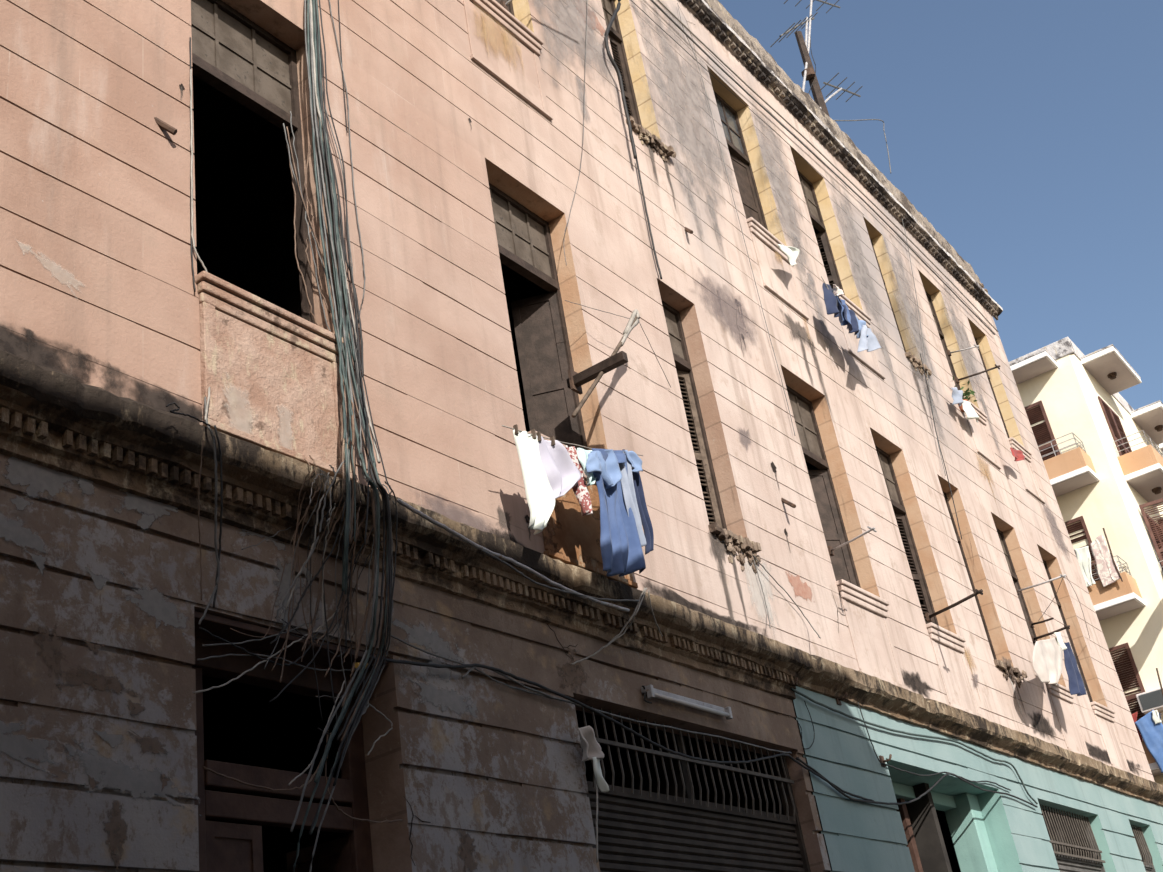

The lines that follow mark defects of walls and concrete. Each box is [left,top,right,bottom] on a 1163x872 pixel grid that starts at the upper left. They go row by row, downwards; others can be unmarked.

damp [535,0,612,73]
damp [632,3,728,237]
damp [0,325,89,384]
damp [105,365,202,424]
peeling [0,457,94,574]
peeling [115,491,178,529]
peeling [121,572,188,634]
peeling [56,666,145,715]
damp [903,672,931,697]
damp [1003,657,1054,737]
peeling [458,829,478,872]